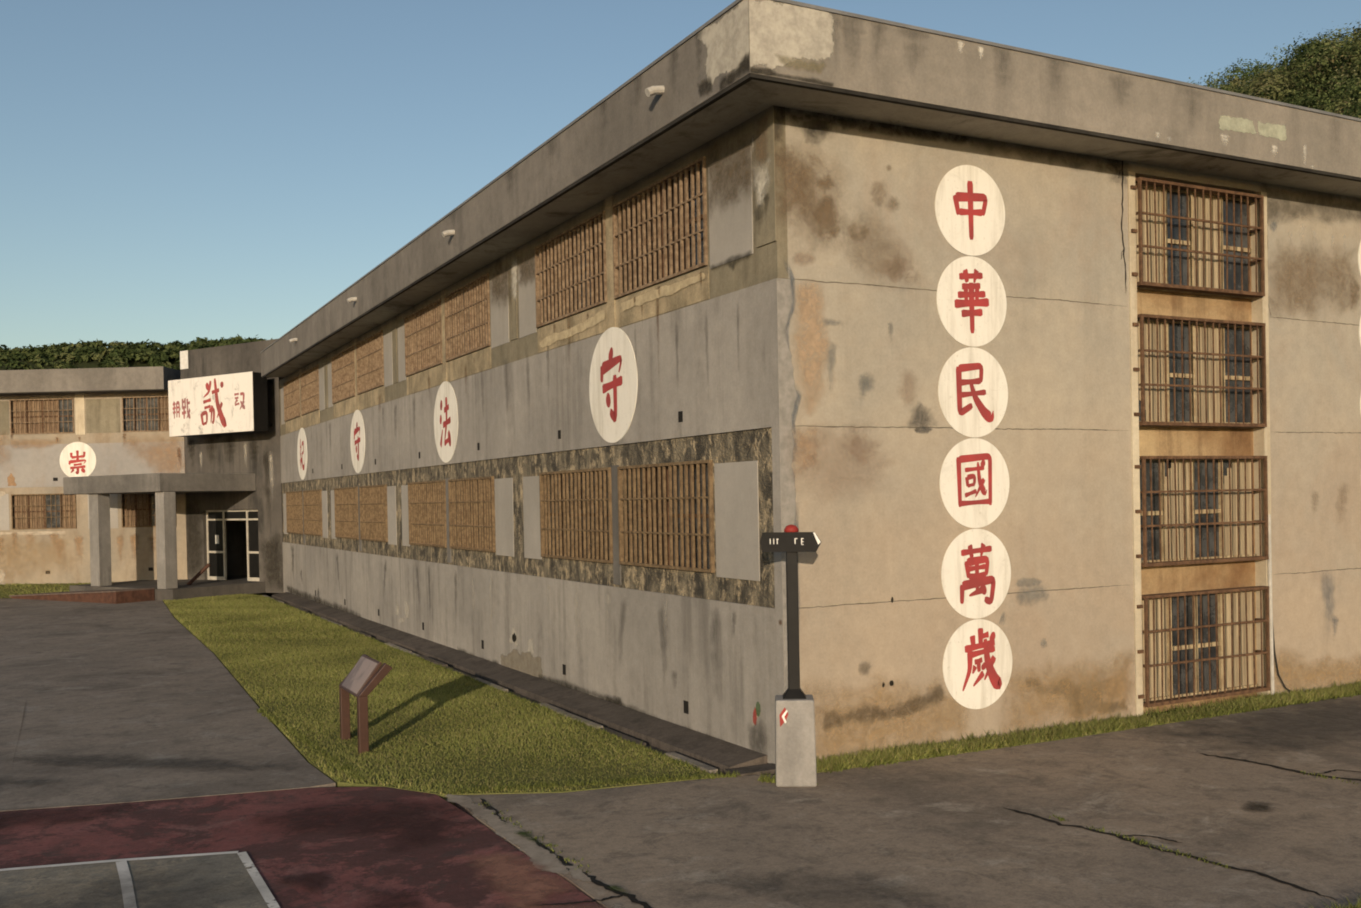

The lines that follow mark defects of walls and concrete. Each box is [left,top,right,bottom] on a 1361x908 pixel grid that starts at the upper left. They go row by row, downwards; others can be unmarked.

peeling [697,0,835,85]
leakage [710,107,967,236]
crack [1118,161,1126,287]
leakage [823,691,961,756]